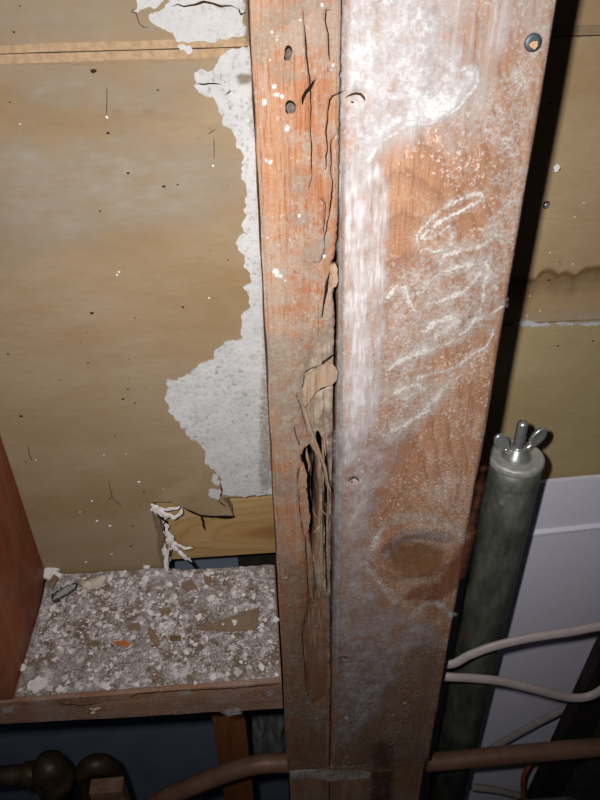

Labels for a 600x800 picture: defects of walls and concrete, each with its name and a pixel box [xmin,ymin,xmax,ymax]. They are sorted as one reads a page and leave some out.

peeling [135,0,272,500]
crack [301,9,342,316]
damp [342,0,505,468]
damp [487,0,532,59]
damp [510,267,600,284]
crack [294,352,336,702]